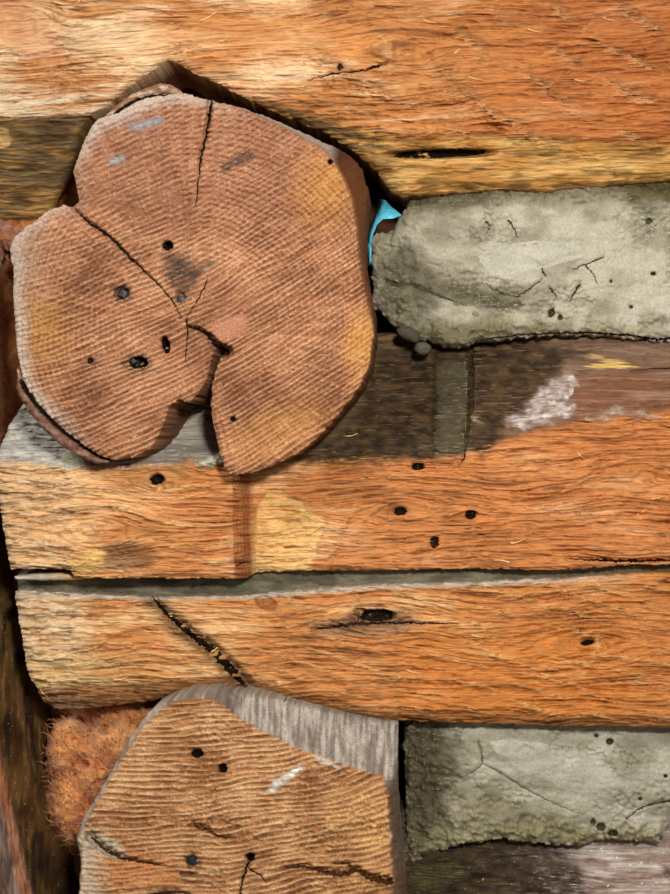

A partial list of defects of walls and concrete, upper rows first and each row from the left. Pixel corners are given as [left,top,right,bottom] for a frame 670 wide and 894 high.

crack [113,93,170,115]
crack [195,99,213,205]
crack [76,210,229,361]
damp [308,330,585,462]
crack [625,800,670,820]
crack [91,836,165,866]
crack [239,856,267,894]